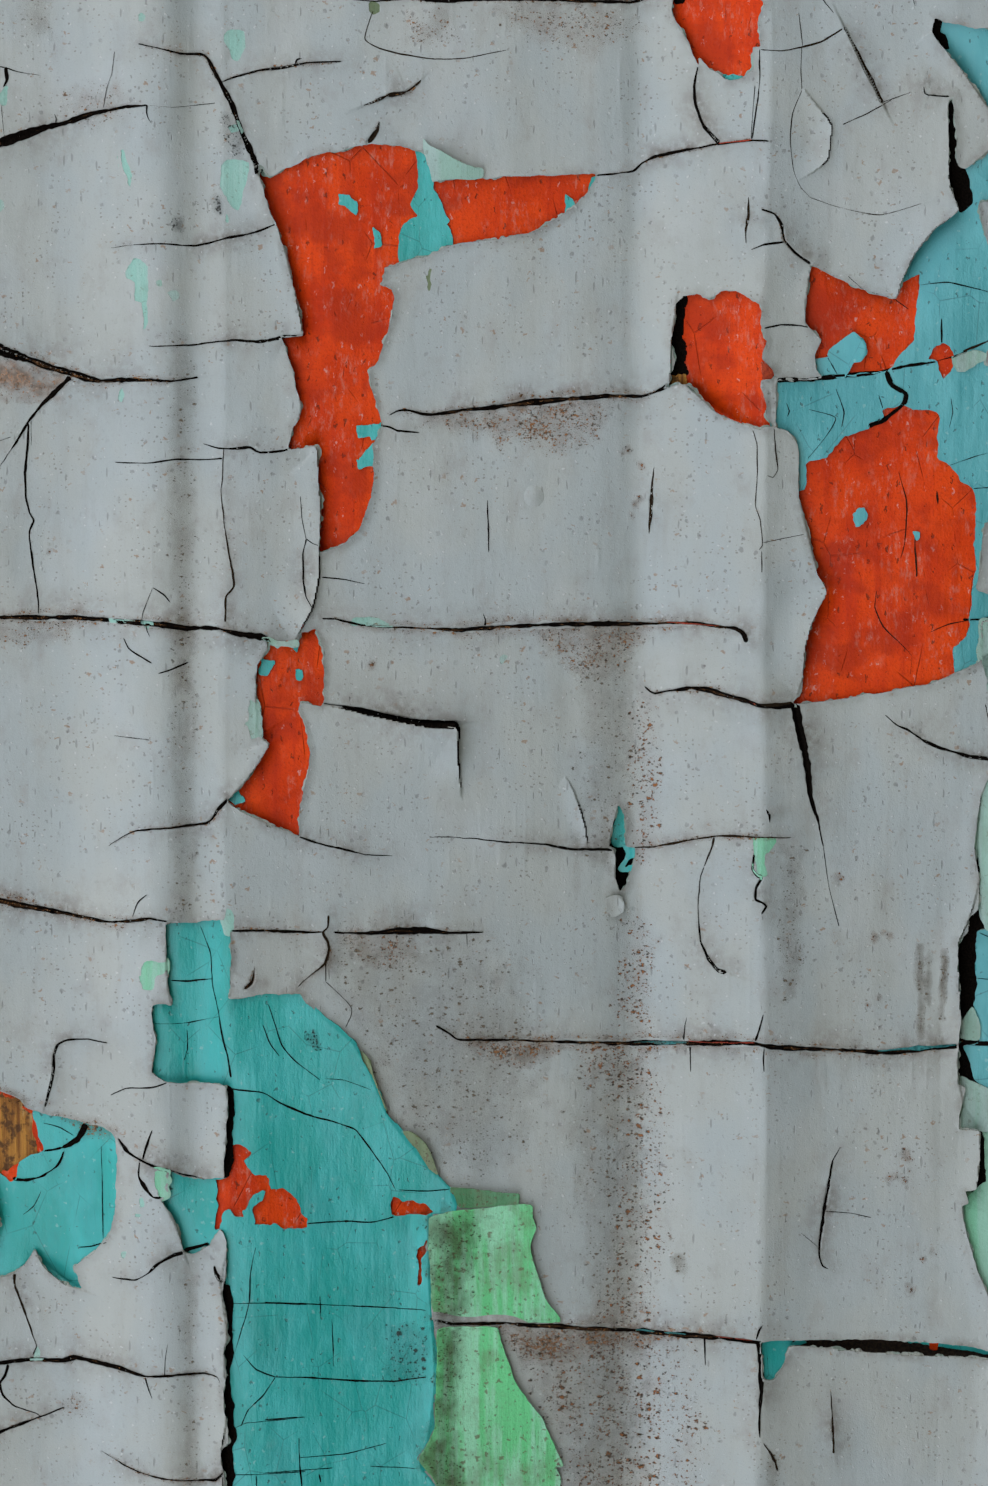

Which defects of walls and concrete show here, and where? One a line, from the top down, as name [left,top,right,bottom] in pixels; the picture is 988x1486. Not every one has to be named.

crack [0,0,643,174]
peeling [671,0,764,80]
corrosion [0,364,63,404]
crack [0,335,304,674]
peeling [220,139,596,556]
peeling [666,99,988,707]
peeling [228,624,325,835]
crack [437,684,839,974]
crack [0,895,483,1224]
peeling [0,908,563,1486]
crack [0,1038,778,1486]
peeling [957,780,988,1295]